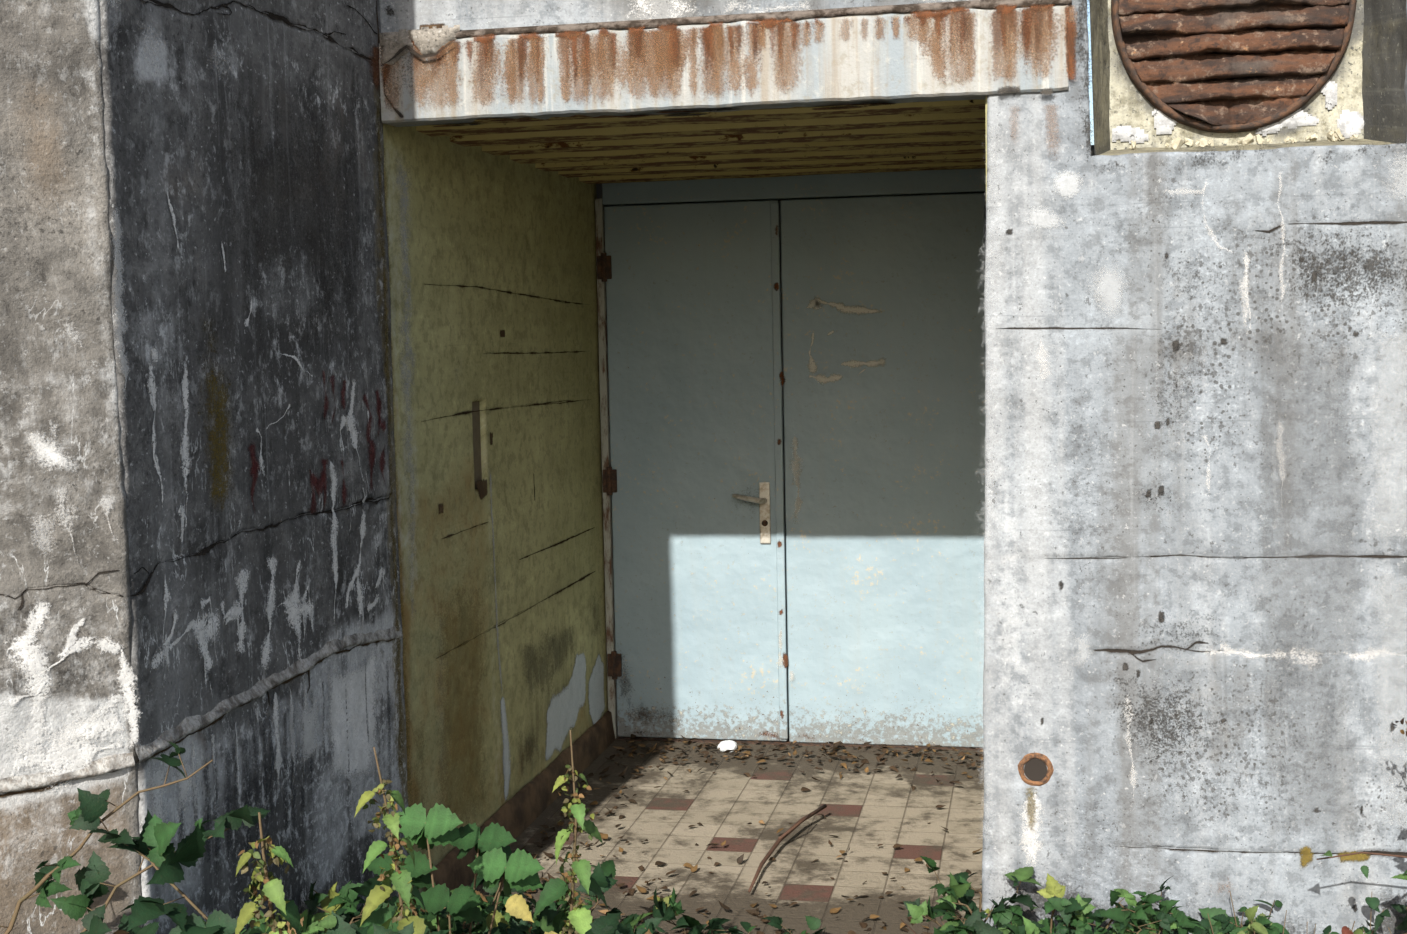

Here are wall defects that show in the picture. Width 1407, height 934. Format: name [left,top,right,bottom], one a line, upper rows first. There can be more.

corrosion [370,46,399,107]
corrosion [436,18,824,118]
corrosion [876,7,976,82]
corrosion [993,4,1077,94]
leakage [147,108,412,862]
crack [0,496,390,610]
crack [1056,552,1407,560]
leakage [5,557,315,789]
peeling [545,653,605,760]
crack [1095,641,1224,662]
crack [0,779,77,797]
crack [1122,846,1407,856]